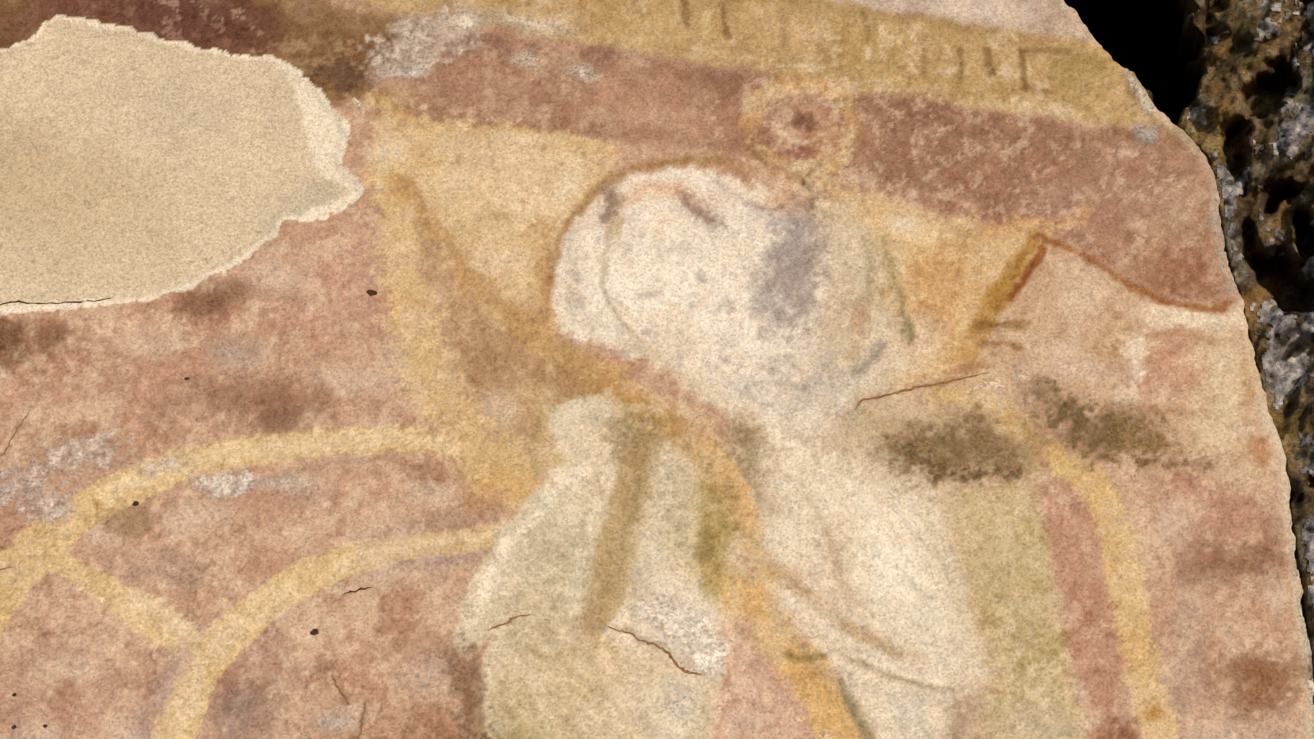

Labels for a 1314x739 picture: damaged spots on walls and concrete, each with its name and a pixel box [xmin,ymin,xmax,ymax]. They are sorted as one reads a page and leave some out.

flaking render [0,14,364,316]
crack [0,410,30,456]
peeling [0,431,116,523]
peeling [143,457,291,498]
crack [608,626,701,675]
crack [332,675,366,739]